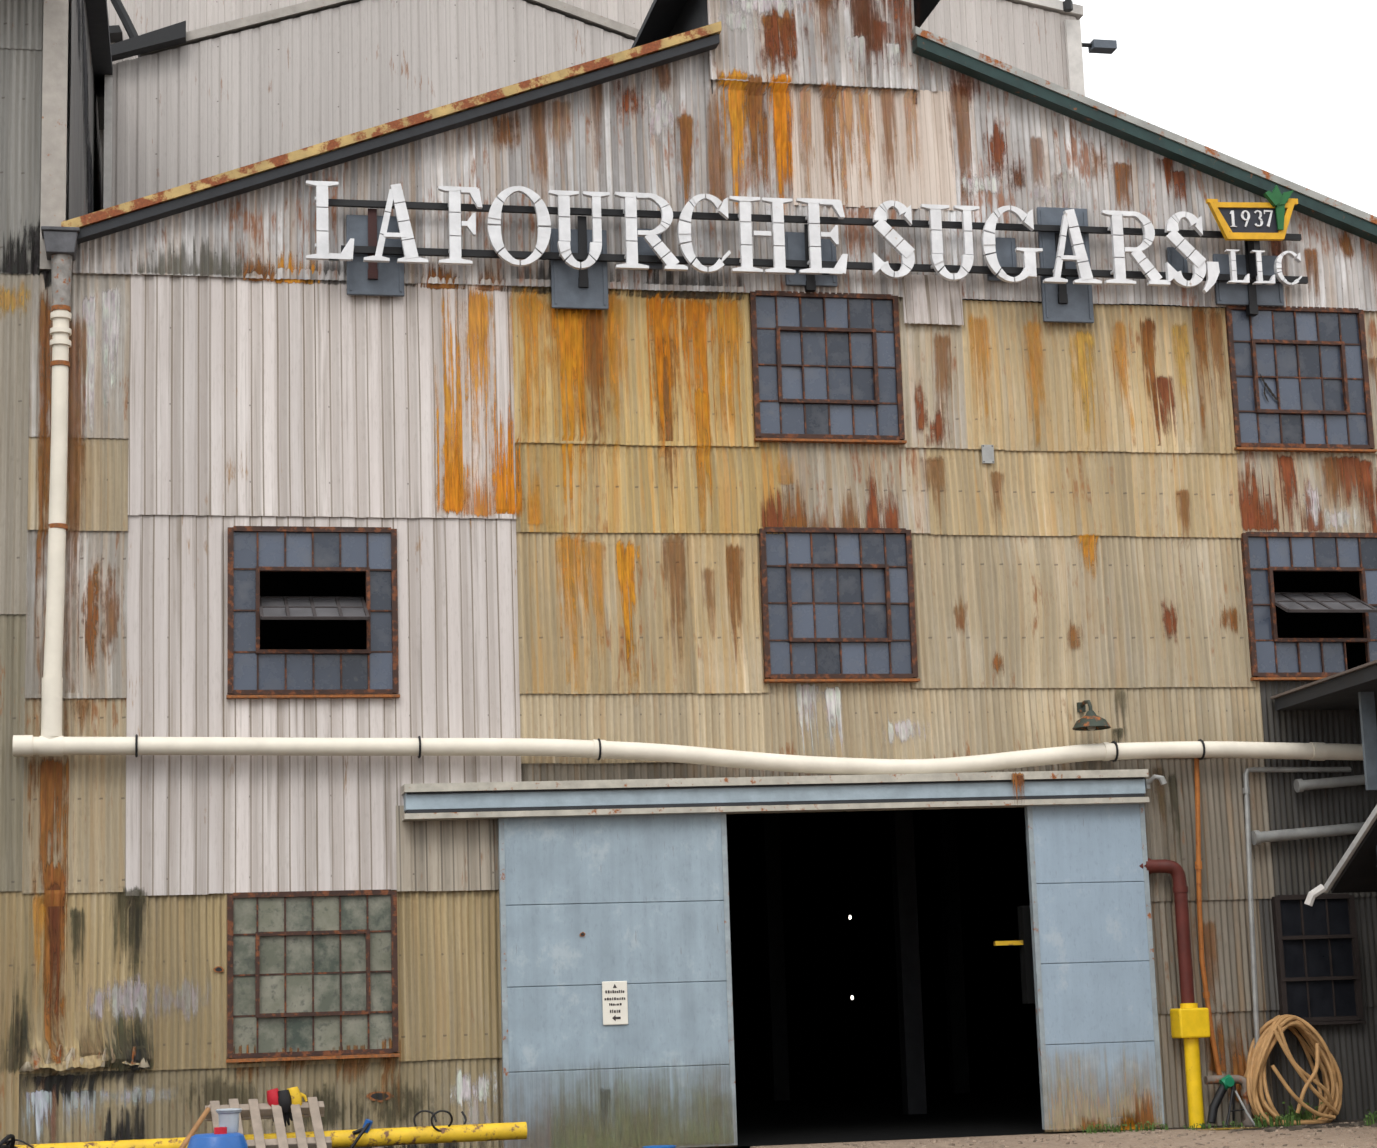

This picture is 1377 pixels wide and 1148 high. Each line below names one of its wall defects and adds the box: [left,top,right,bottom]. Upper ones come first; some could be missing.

corrosion [674,0,918,206]
corrosion [949,69,1026,196]
corrosion [243,254,320,284]
corrosion [0,283,119,673]
corrosion [421,264,612,670]
corrosion [646,293,741,513]
corrosion [1238,455,1377,533]
corrosion [28,757,69,1142]
damp [70,909,84,962]
damp [114,886,145,983]
damp [1,992,154,1141]
damp [513,1099,724,1148]